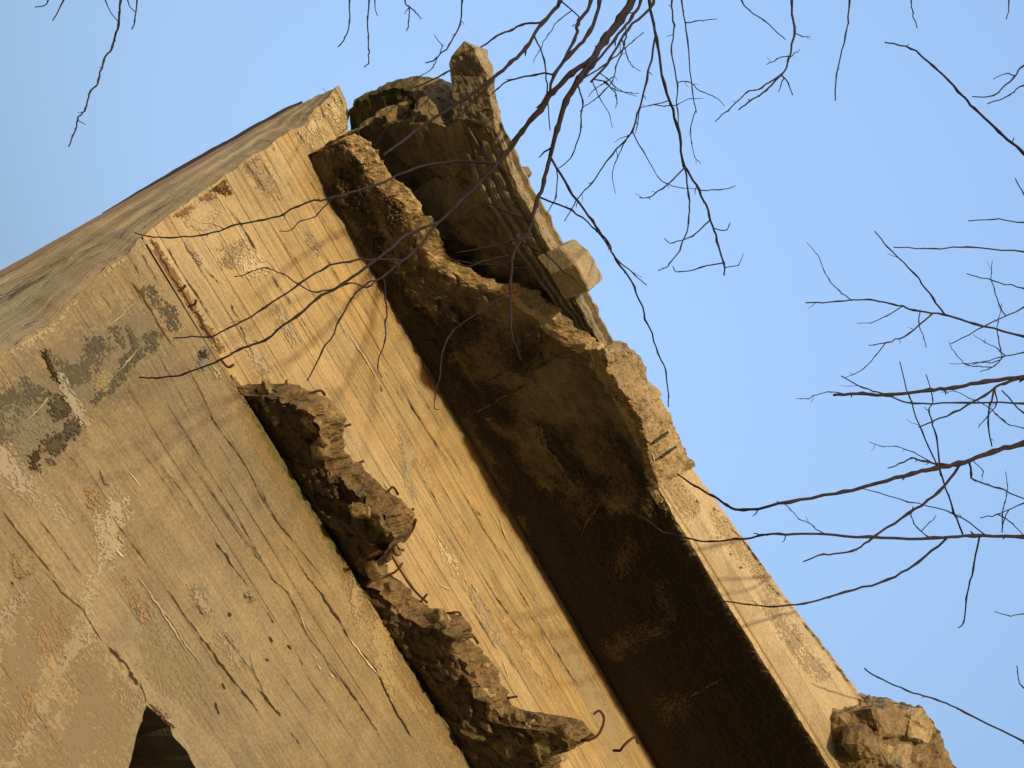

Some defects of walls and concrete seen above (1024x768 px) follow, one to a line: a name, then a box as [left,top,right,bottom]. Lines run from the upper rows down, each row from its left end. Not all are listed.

spalling [293,93,349,150]
spalling [377,194,410,229]
rust [149,238,226,354]
leakage [0,284,182,522]
spalling [589,340,695,488]
crack [1,509,147,703]
crack [93,337,419,748]
spalling [363,547,428,604]
rust [495,600,562,702]
spalling [581,710,605,742]